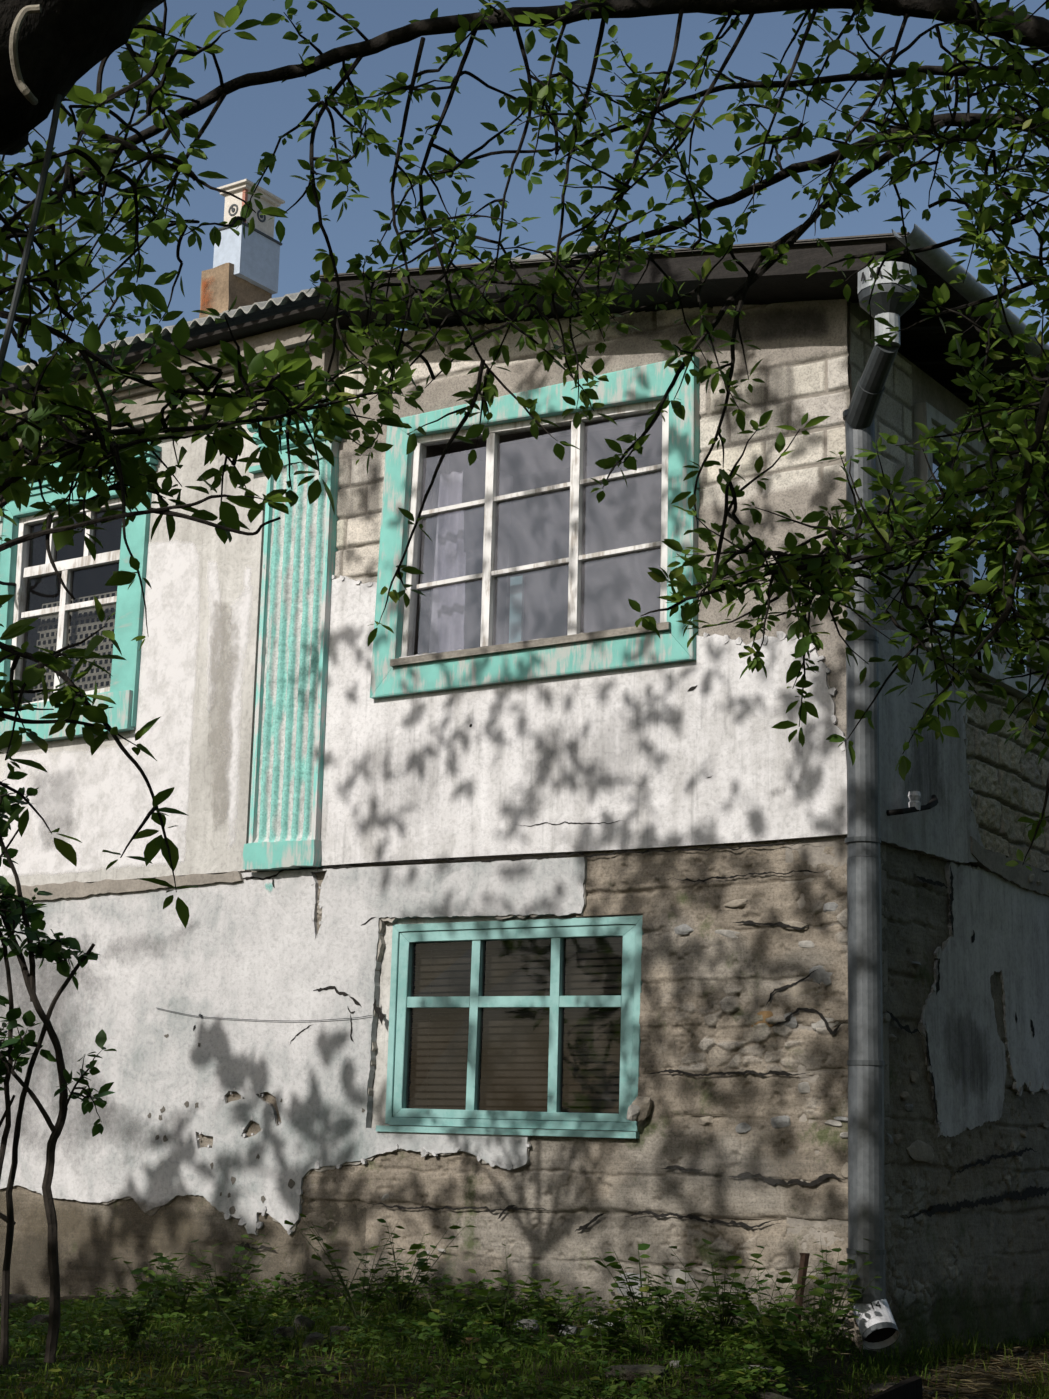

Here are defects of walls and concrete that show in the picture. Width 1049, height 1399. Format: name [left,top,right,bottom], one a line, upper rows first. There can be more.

crack [243,821,844,888]
crack [313,986,385,1042]
crack [887,865,975,1132]
crack [1015,1014,1035,1038]
spalling [221,1088,282,1138]
flaking render [285,836,1049,1360]
spalling [197,1132,216,1169]
flaking render [220,1177,267,1228]
crack [902,1147,1049,1219]